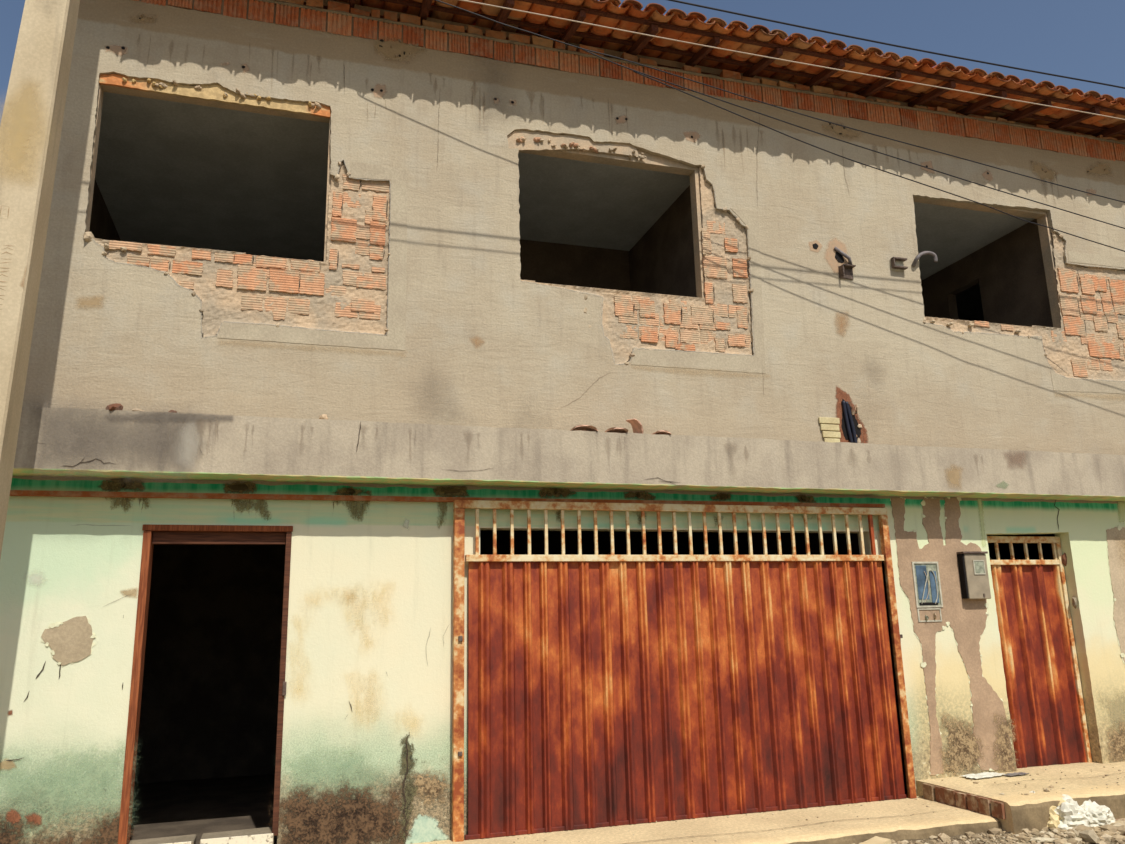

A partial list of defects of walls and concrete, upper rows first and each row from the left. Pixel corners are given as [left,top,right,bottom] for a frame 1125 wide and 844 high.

peeling [516,137,599,153]
flaking render [83,159,391,338]
flaking render [521,165,755,365]
flaking render [923,230,1125,382]
leakage [45,413,232,464]
hole [818,387,868,443]
peeling [1106,525,1125,664]
peeling [36,616,96,678]
peeling [890,497,1013,776]
leakage [1107,699,1125,763]
leakage [0,814,130,844]
leakage [279,774,449,844]